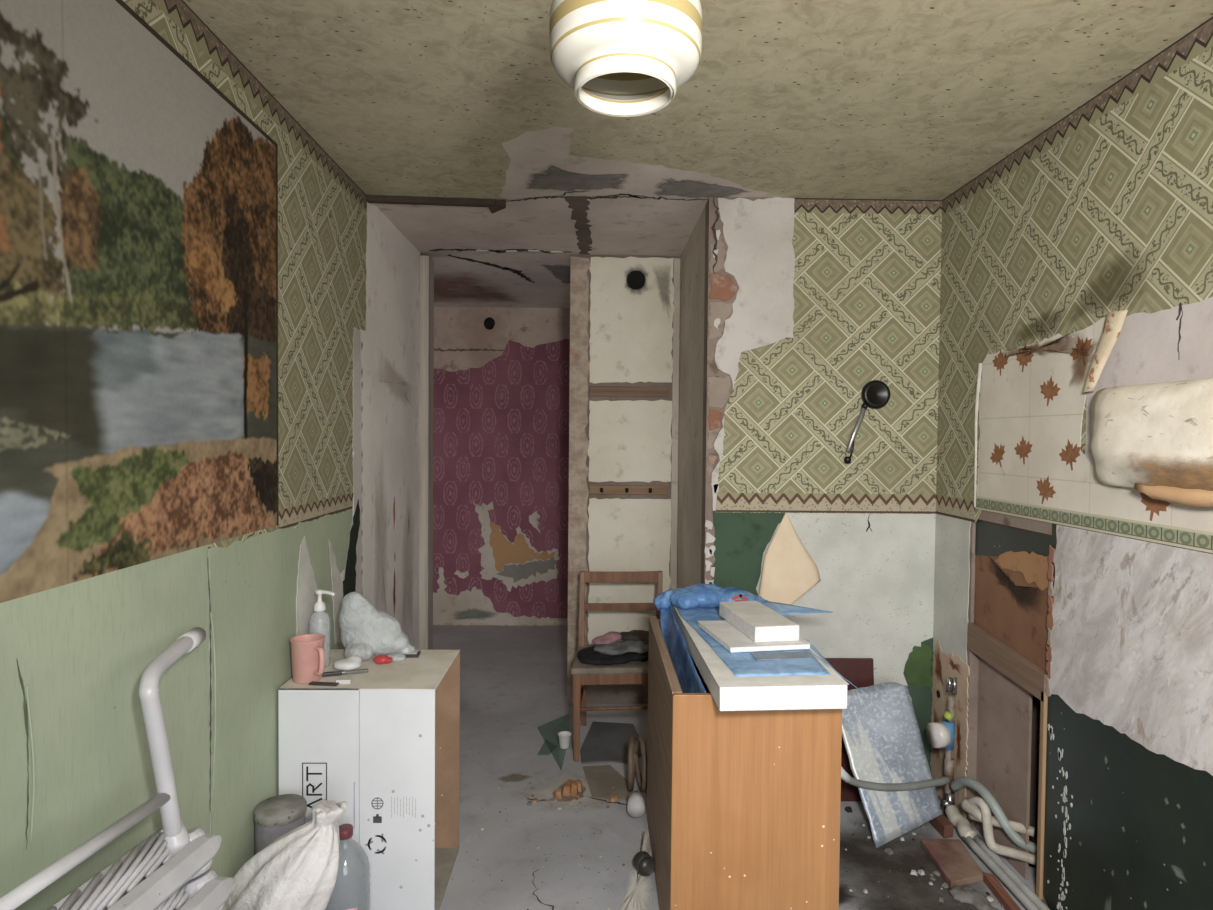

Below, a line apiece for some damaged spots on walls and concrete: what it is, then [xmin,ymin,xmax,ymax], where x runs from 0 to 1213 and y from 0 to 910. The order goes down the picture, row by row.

flaking render [704,197,795,584]
flaking render [1085,297,1213,467]
crack [16,659,35,850]
crack [207,557,216,805]
crack [532,868,554,910]
peeling [1047,724,1073,910]
peeling [994,525,1213,776]